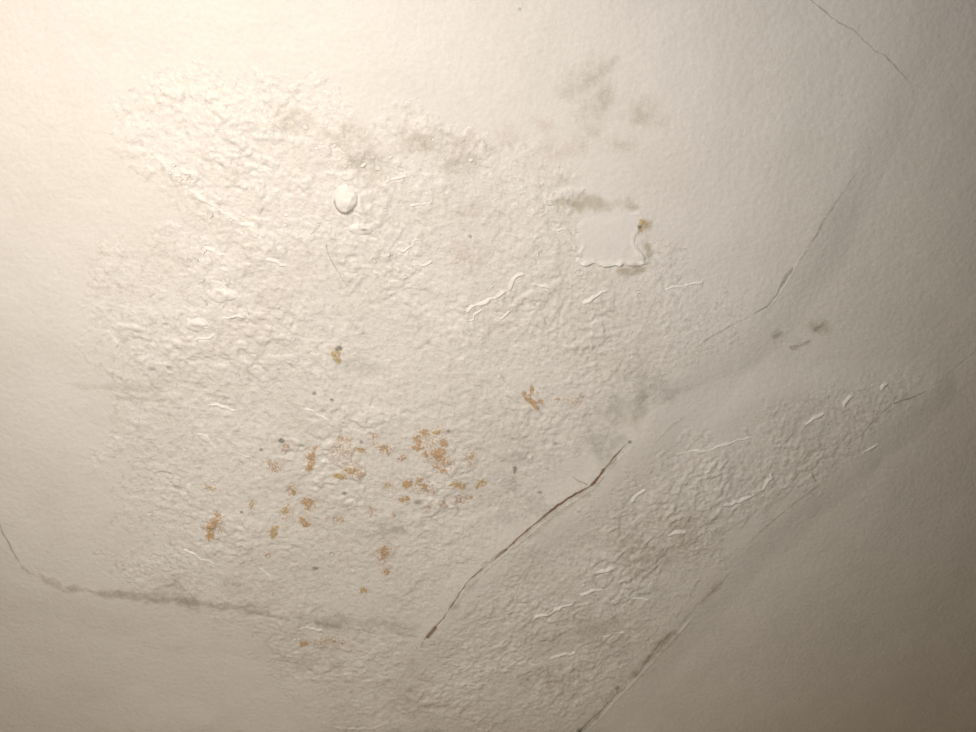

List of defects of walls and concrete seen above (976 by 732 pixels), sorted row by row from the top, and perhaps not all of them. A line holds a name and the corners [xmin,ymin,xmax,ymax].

corrosion [206,513,221,541]
peeling [73,96,773,732]
corrosion [412,429,451,473]
crack [426,441,630,638]